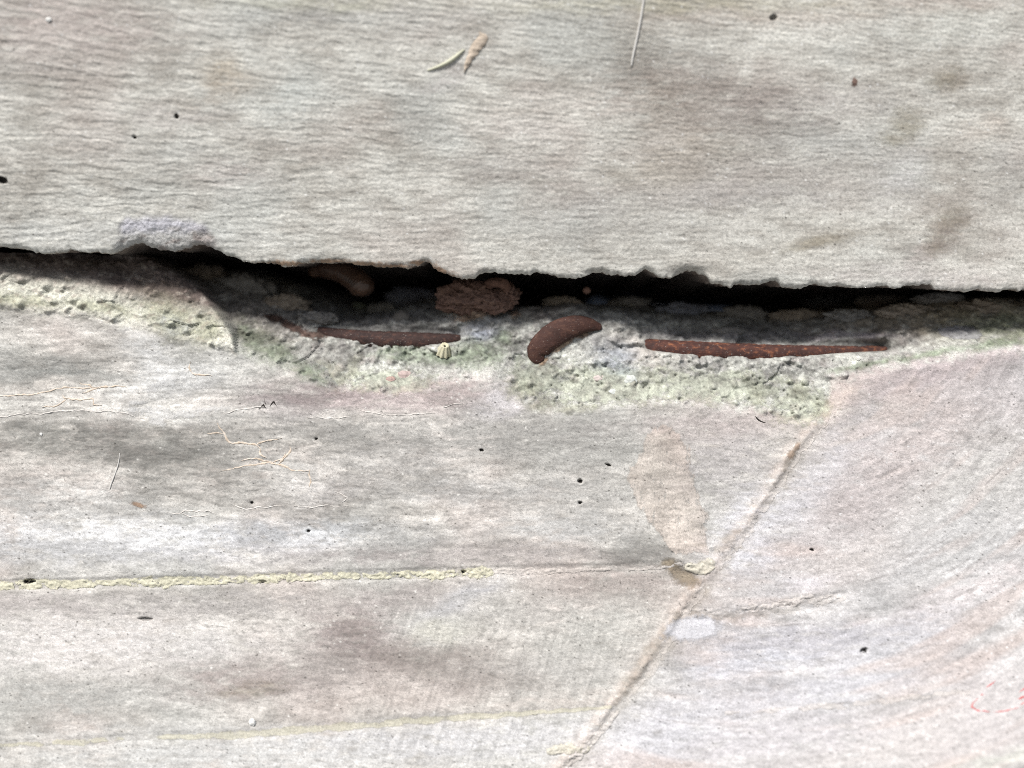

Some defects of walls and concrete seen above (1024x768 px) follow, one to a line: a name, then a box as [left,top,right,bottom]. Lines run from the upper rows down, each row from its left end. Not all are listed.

spalling [0,215,1024,423]
corrosion [540,333,589,365]